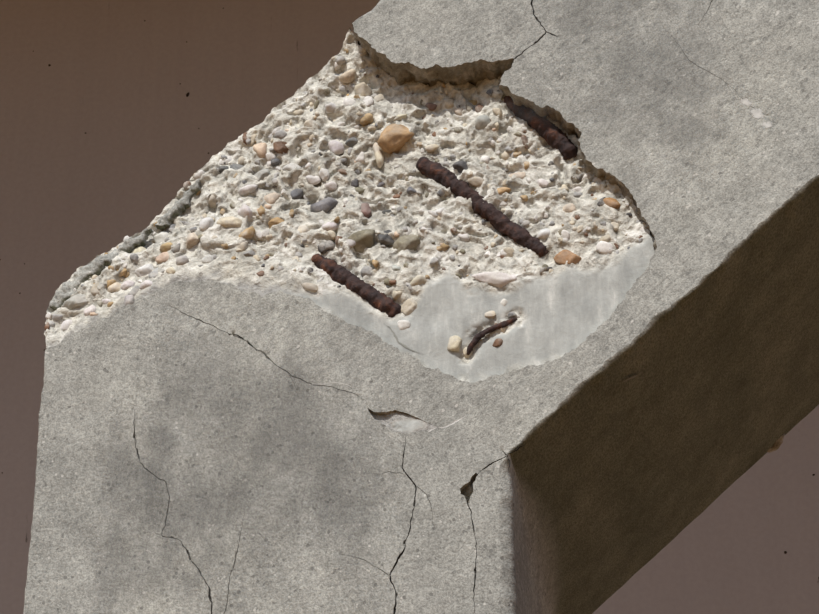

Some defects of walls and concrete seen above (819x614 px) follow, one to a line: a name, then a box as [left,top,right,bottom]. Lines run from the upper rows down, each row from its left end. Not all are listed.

crack [513,0,557,61]
spalling [44,27,657,383]
crack [173,307,371,408]
crack [386,325,422,354]
crack [428,414,468,432]
crack [478,445,524,474]
crack [133,410,245,614]
crack [341,438,433,614]
crack [467,502,477,612]